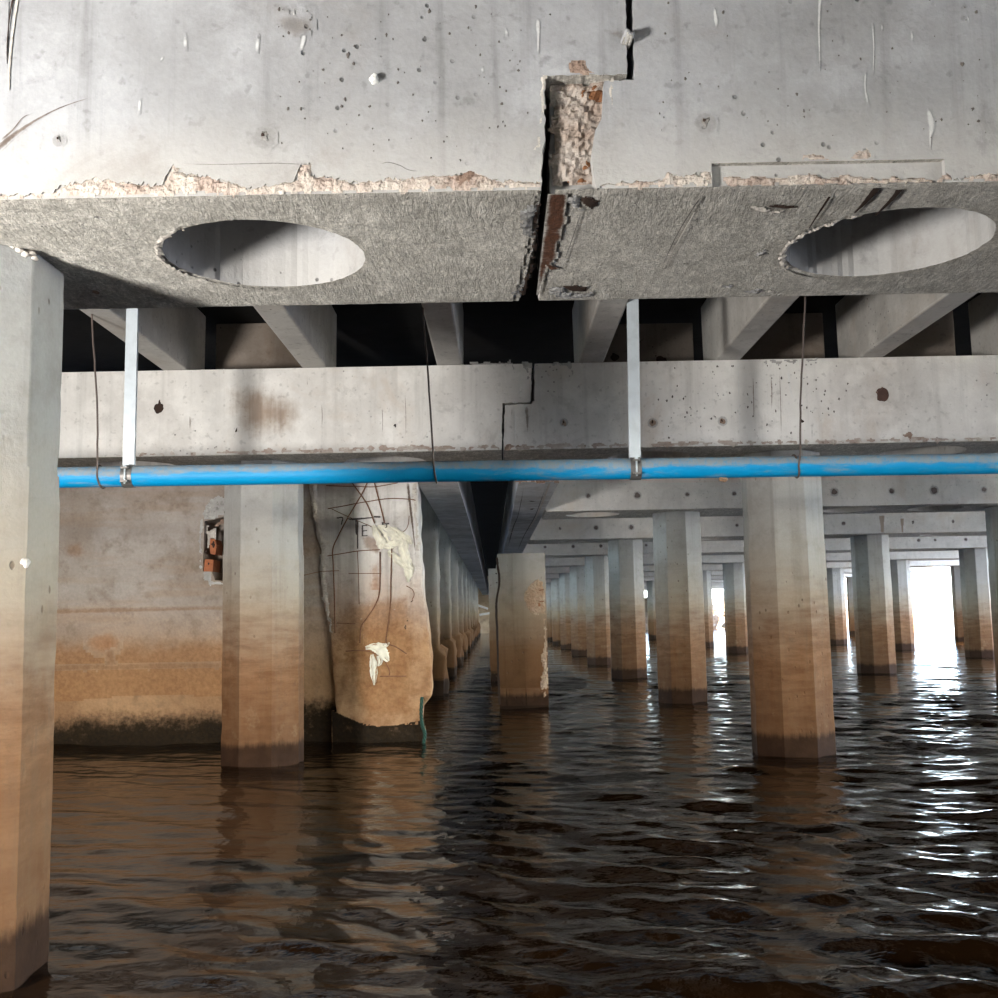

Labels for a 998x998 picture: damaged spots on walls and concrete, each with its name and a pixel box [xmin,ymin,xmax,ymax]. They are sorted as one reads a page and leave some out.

crack [0,98,89,152]
spalling [0,60,711,211]
spalling [723,173,998,189]
rust [536,194,568,295]
spalling [198,495,224,586]
spalling [306,482,420,677]
spalling [524,579,548,697]
water stain [0,465,318,993]